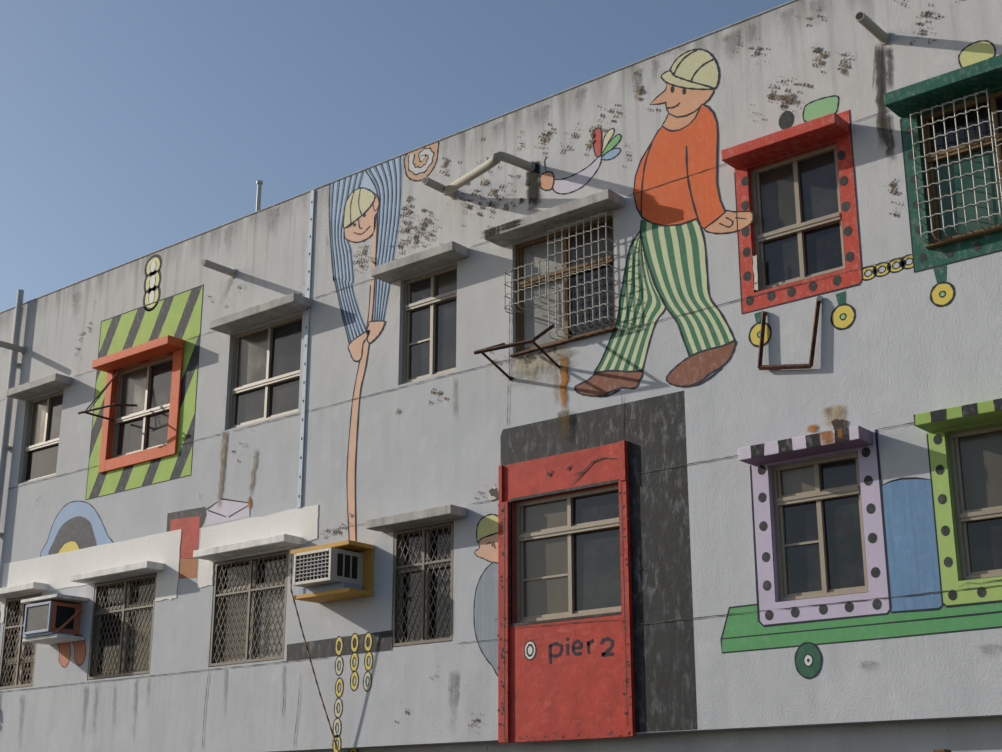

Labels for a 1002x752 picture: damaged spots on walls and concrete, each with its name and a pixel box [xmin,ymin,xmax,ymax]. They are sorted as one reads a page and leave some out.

peeling [909,3,941,45]
peeling [811,46,853,76]
peeling [767,76,811,117]
damp [873,46,894,155]
peeling [439,150,529,227]
peeling [384,196,442,261]
rust [558,358,569,435]
rust [808,406,842,443]